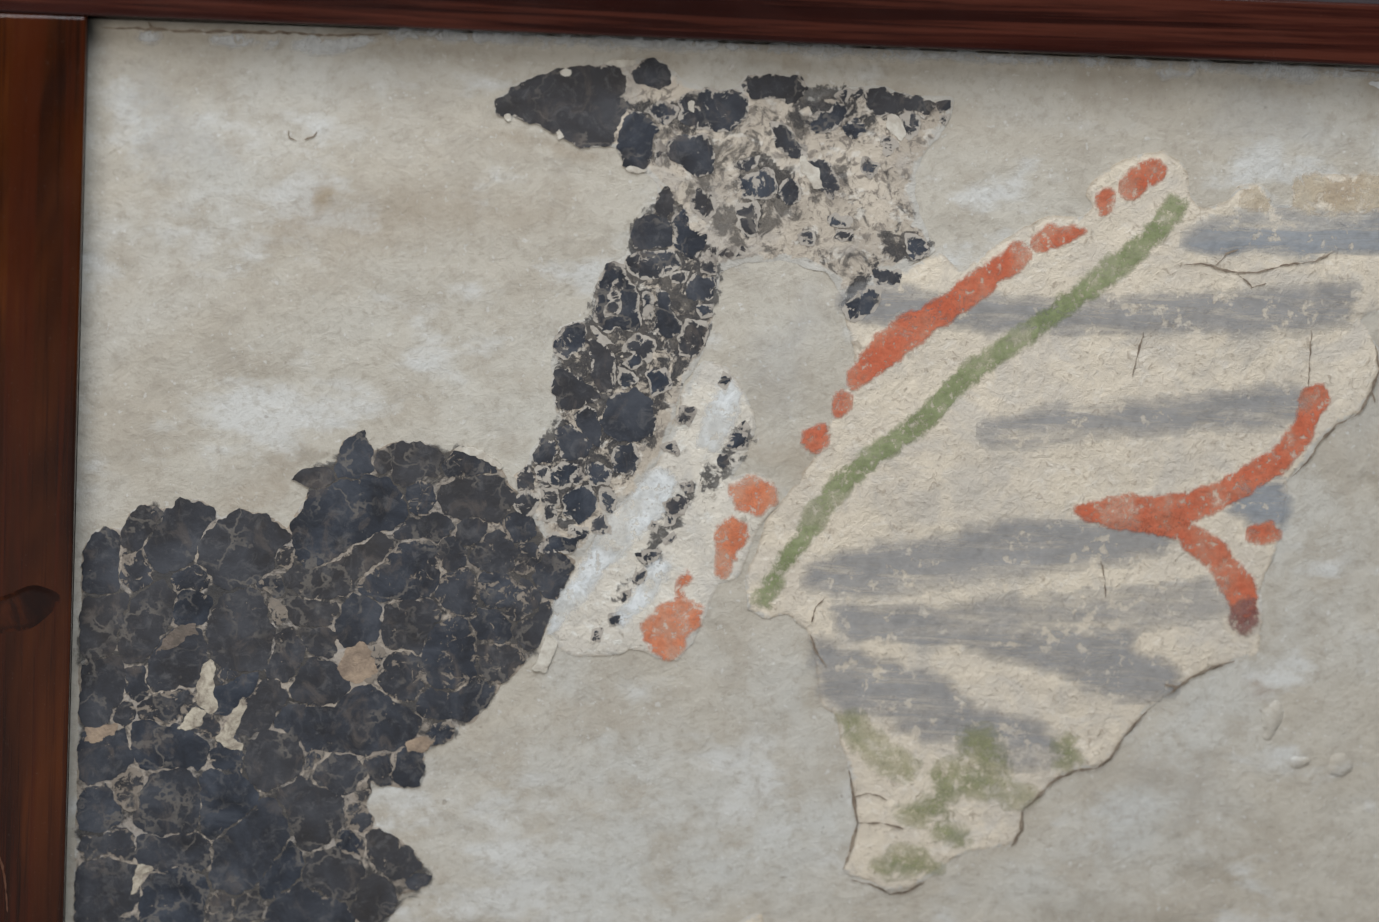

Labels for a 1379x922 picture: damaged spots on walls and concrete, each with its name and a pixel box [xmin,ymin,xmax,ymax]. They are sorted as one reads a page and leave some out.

spalling [389,29,518,43]
spalling [541,37,797,51]
spalling [892,52,1053,63]
spalling [1135,60,1211,76]
spalling [1252,66,1379,89]
crack [1185,249,1335,288]
crack [810,599,826,665]
crack [1011,660,1235,846]
crack [843,770,925,895]